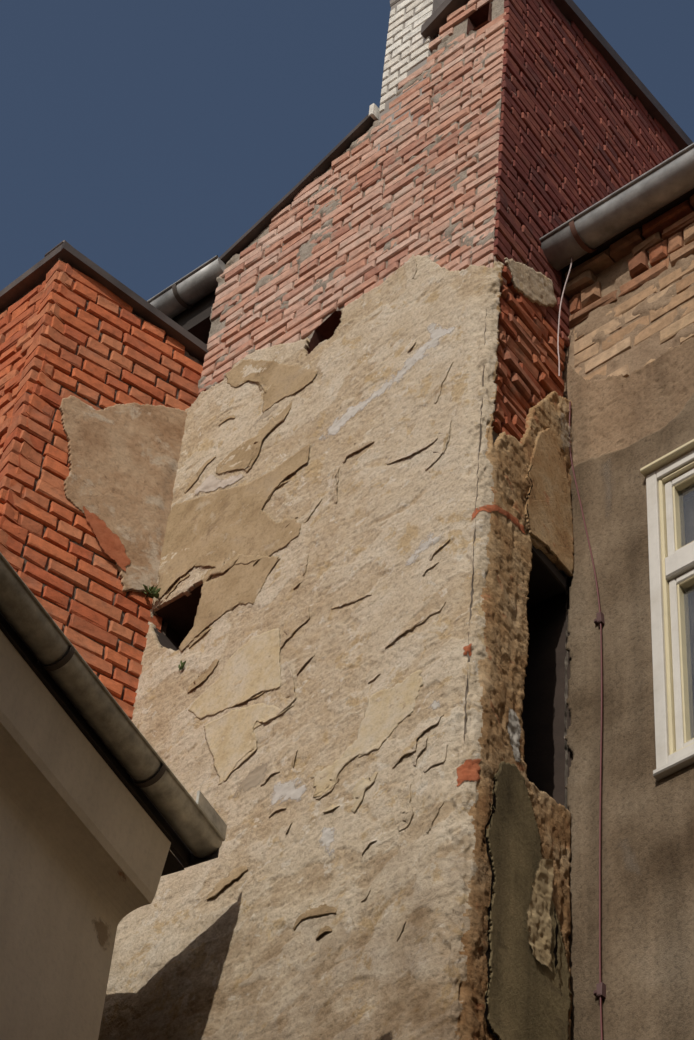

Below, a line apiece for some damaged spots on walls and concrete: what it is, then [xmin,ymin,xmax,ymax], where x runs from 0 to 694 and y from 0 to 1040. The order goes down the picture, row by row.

spalling [307,310,342,354]
flaking render [471,258,574,576]
peeling [157,323,455,652]
peeling [392,700,448,773]
flaking render [456,759,482,787]
peeling [485,708,572,1040]
peeling [293,901,337,940]